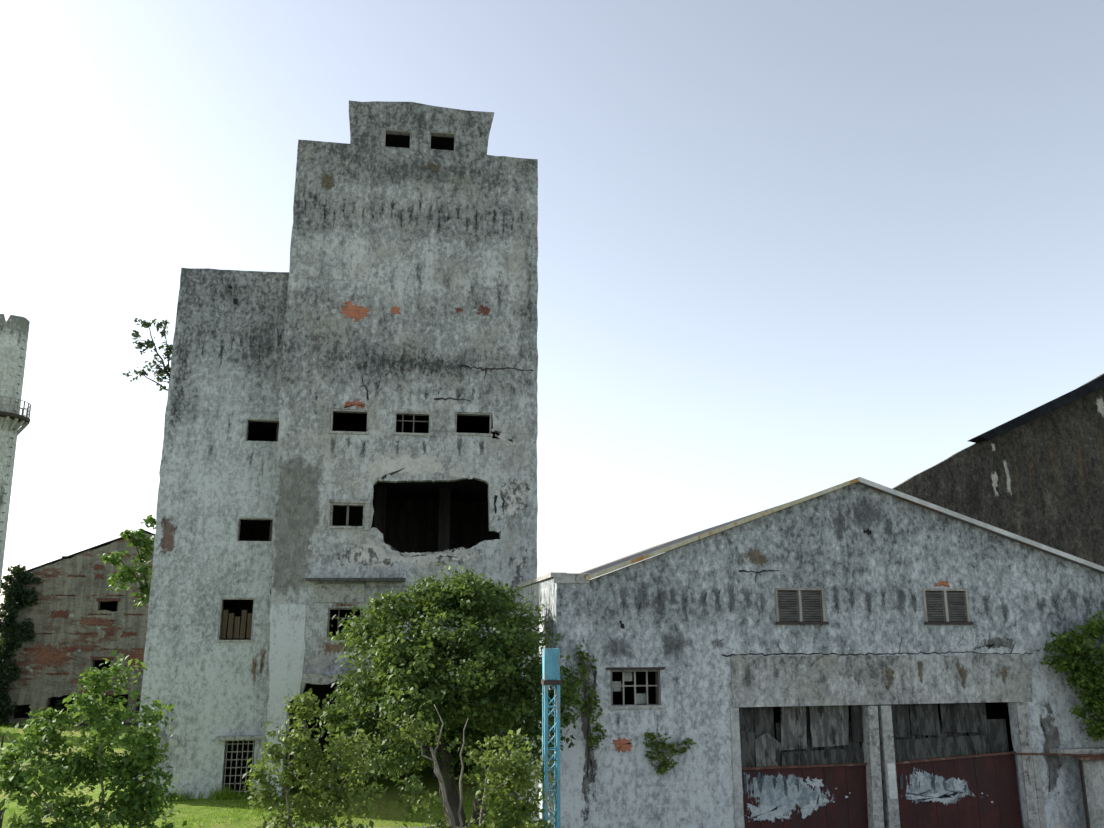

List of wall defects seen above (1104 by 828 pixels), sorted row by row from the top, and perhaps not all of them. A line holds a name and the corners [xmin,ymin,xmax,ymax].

damp [297,175,523,232]
crack [434,361,534,401]
spalling [131,501,182,579]
damp [273,459,321,591]
peeling [322,466,535,615]
damp [620,589,688,620]
damp [700,589,764,616]
damp [834,587,916,613]
spalling [23,610,147,678]
peeling [576,639,636,821]
peeling [743,772,850,822]
peeling [900,769,993,805]